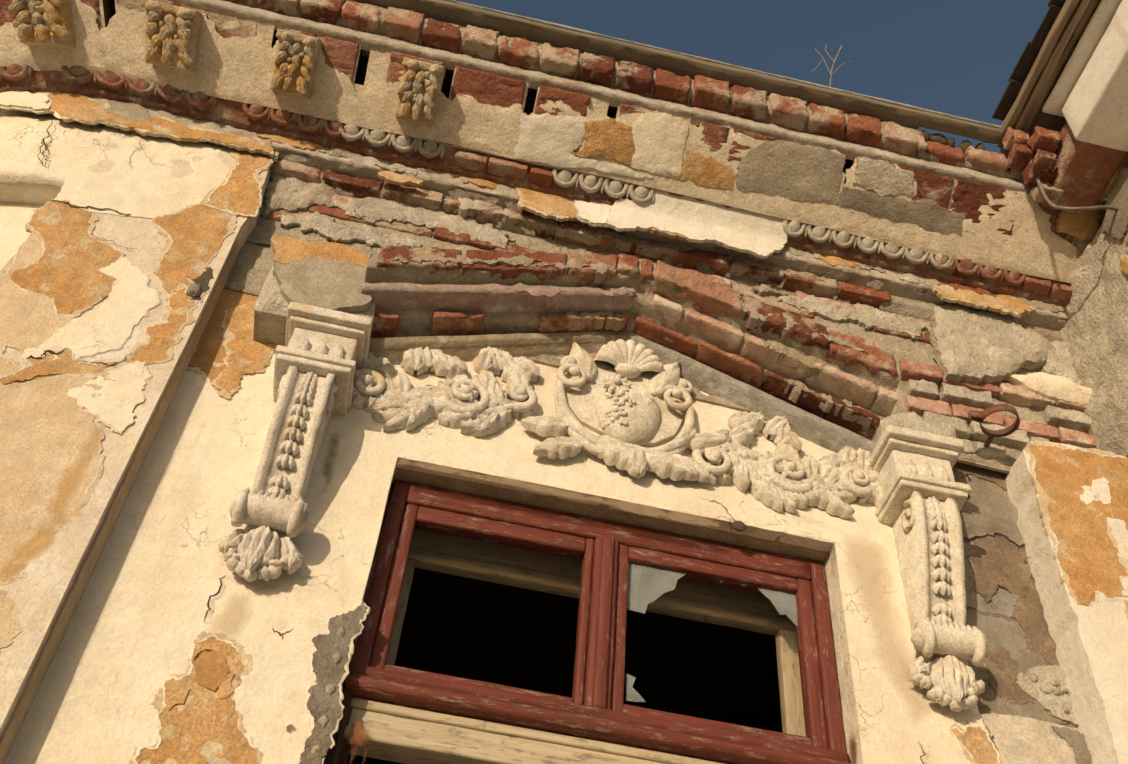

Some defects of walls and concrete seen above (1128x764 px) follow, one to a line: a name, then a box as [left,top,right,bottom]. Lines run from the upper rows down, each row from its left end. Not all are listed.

peeling [515,187,607,226]
peeling [574,118,635,165]
peeling [680,149,737,190]
peeling [0,90,279,652]
flaking render [929,284,1081,385]
flaking render [952,462,1007,491]
crack [963,532,1035,580]
peeling [1023,441,1128,619]
peeling [129,631,263,764]
flaking render [285,600,370,764]
flaking render [966,533,1092,764]
crack [918,741,929,764]